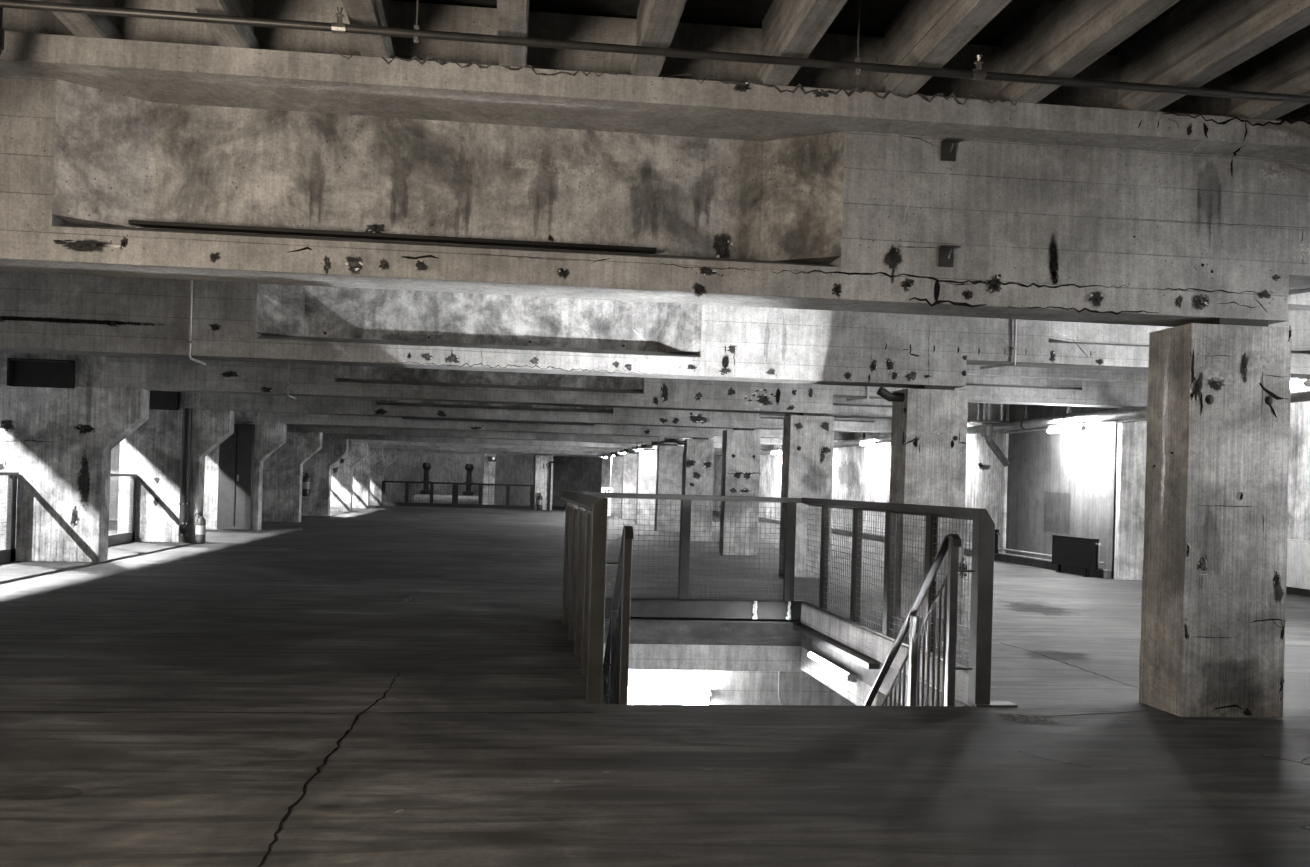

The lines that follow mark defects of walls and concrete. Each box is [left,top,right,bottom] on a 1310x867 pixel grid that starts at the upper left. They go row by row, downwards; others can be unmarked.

spalling [53,237,128,252]
spalling [719,345,813,411]
spalling [1190,349,1225,401]
spalling [1259,383,1286,418]